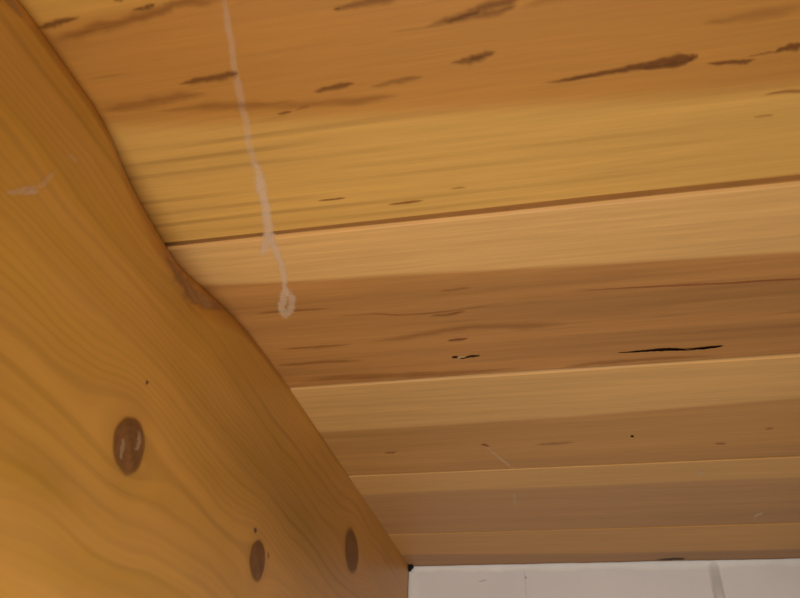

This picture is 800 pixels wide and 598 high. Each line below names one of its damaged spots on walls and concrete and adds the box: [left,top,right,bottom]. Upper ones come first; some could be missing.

crack [619,345,722,353]
crack [452,353,480,361]